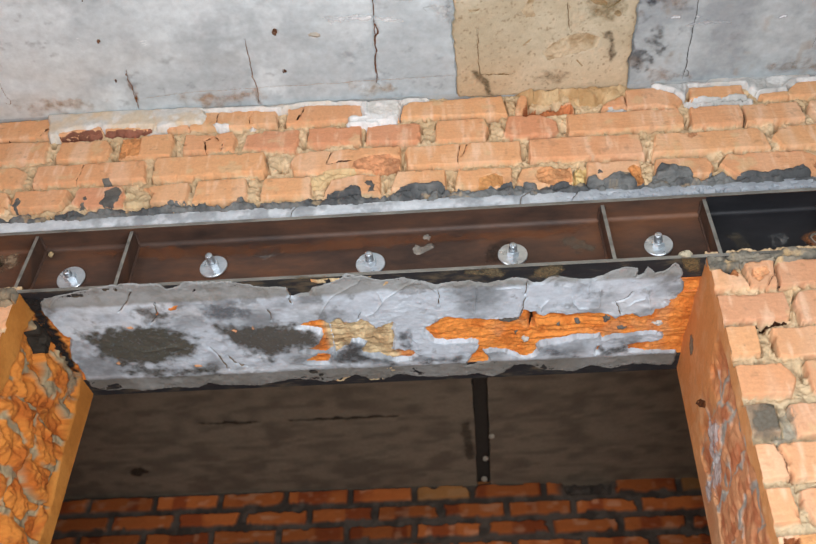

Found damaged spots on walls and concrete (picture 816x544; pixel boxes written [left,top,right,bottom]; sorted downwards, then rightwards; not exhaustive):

crack [125,0,401,108]
crack [682,0,699,78]
damp [84,309,216,378]
damp [210,306,318,362]